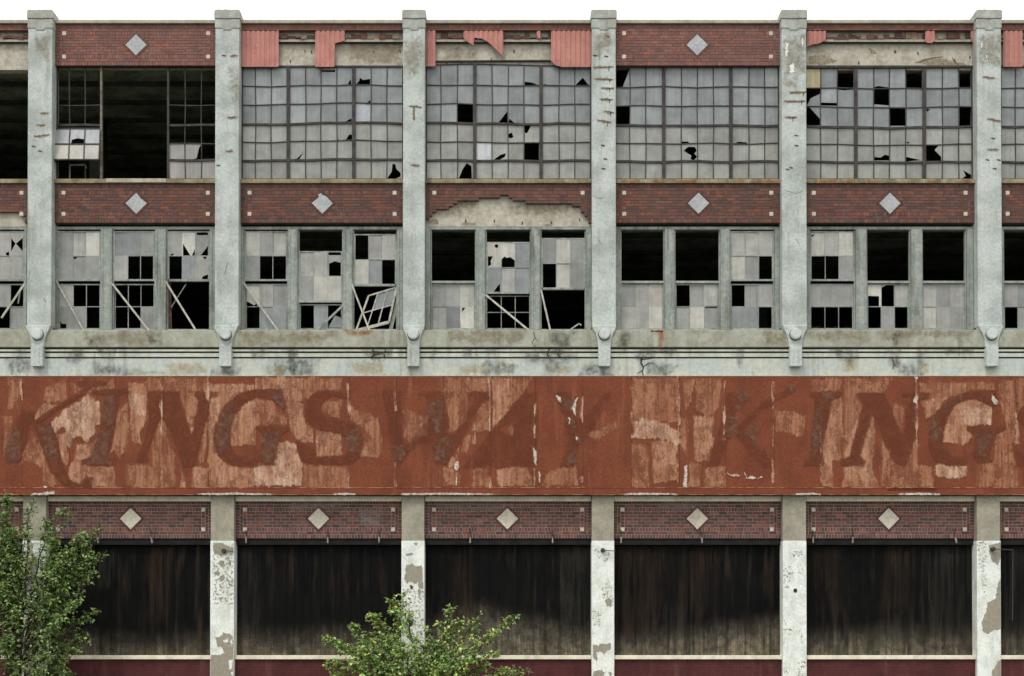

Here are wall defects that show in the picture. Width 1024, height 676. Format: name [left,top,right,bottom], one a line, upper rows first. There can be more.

spalling [426,196,591,227]
peeling [210,632,233,676]
peeling [212,543,234,605]
peeling [403,542,424,652]
peeling [593,581,613,676]
peeling [977,541,1001,634]